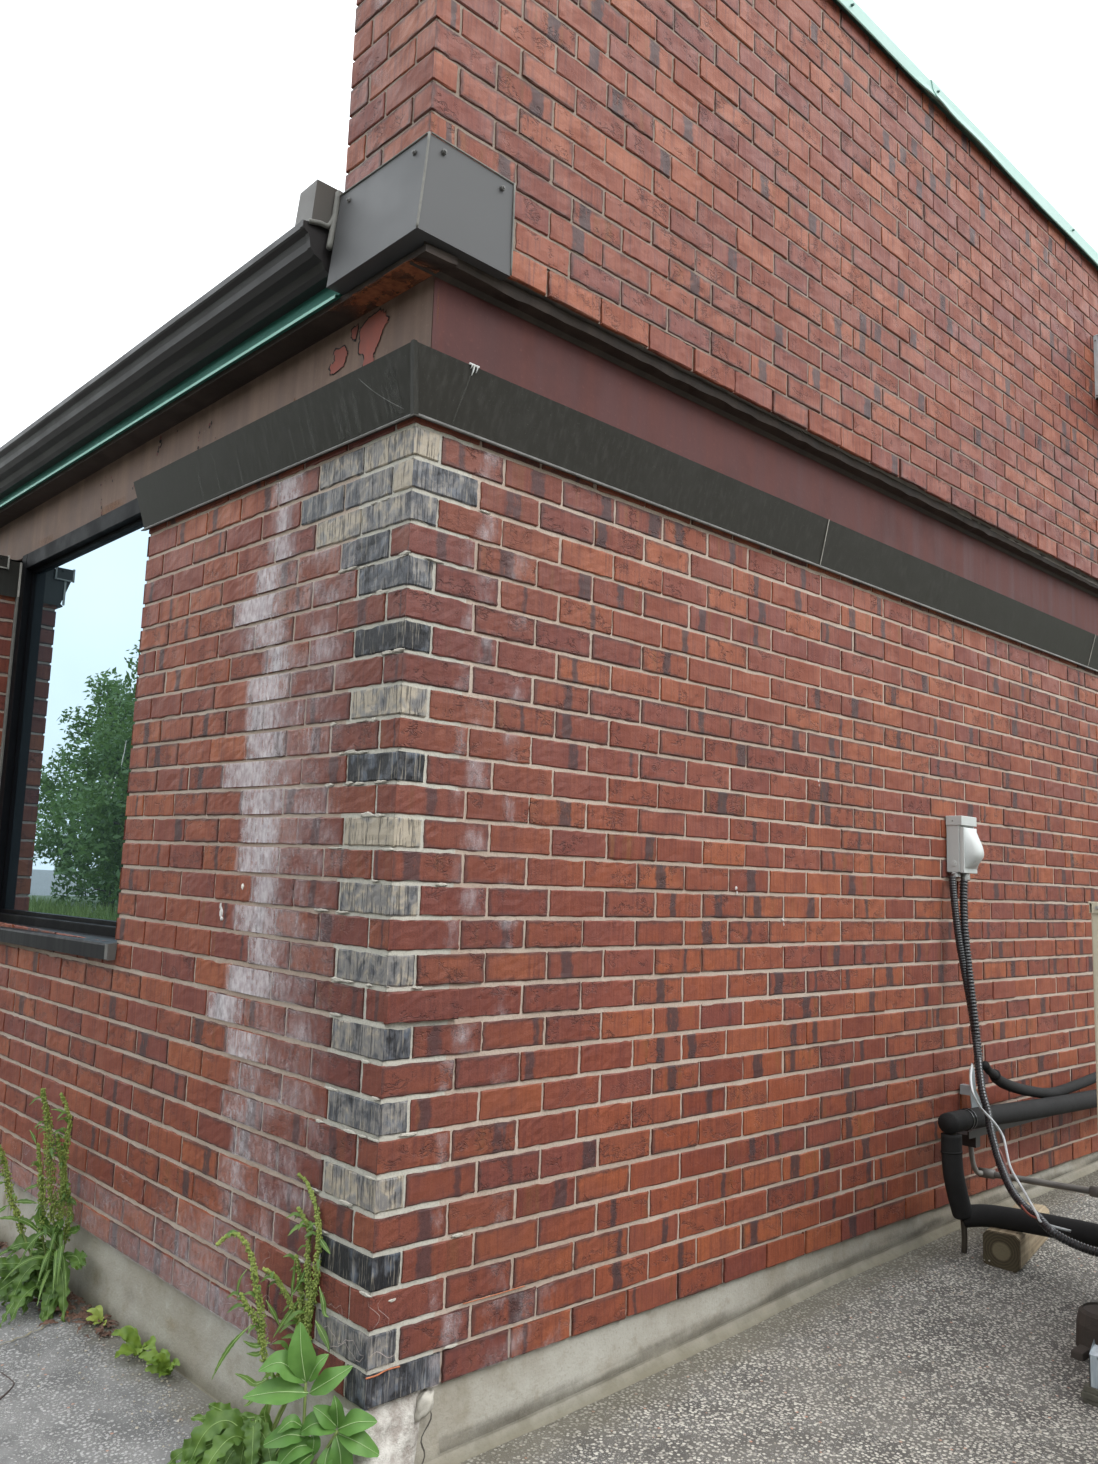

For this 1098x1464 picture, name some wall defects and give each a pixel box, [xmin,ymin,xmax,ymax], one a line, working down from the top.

peeling [328,307,390,375]
damp [210,480,293,1061]